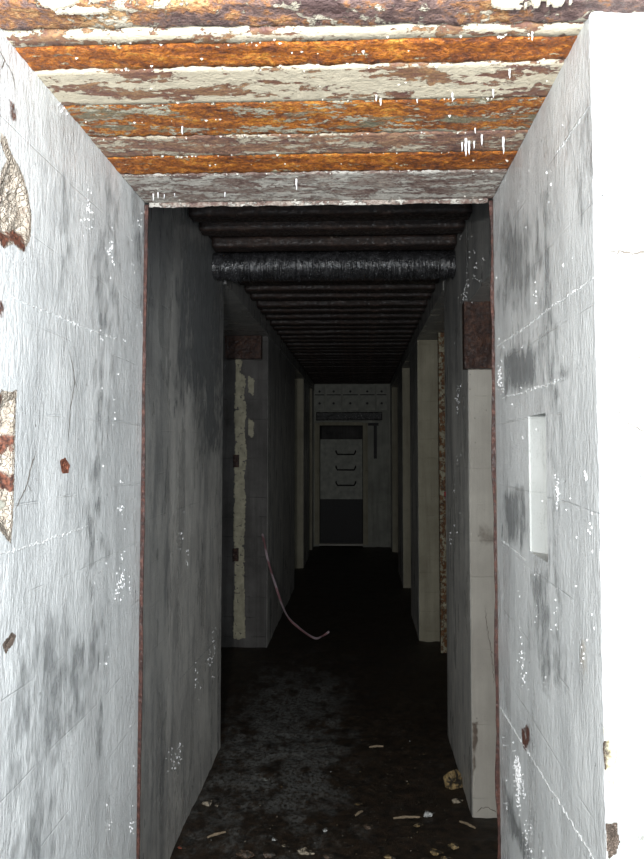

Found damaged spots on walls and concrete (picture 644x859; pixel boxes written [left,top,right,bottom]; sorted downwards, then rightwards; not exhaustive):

peeling [37,0,109,15]
peeling [491,0,572,10]
rust [15,35,577,71]
rust [63,97,545,137]
rust [107,151,517,175]
spalling [0,133,31,251]
crack [605,249,644,257]
damp [504,348,535,395]
spalling [0,389,17,543]
damp [502,495,525,546]
damp [44,637,84,713]
spalling [606,822,620,858]